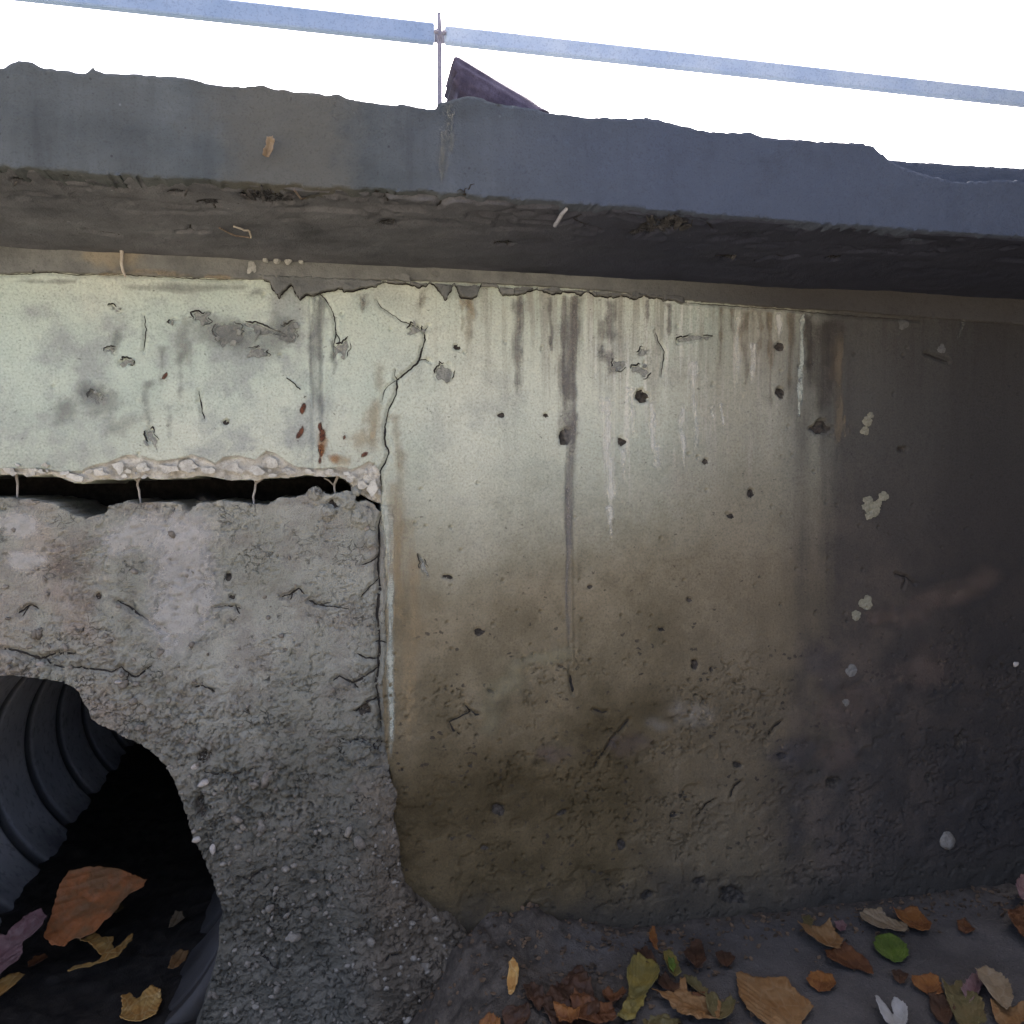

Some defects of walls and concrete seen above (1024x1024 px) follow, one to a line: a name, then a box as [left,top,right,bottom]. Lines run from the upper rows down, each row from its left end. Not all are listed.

peeling [257,271,685,305]
spalling [0,426,381,503]
spalling [190,310,299,358]
corrosion [296,396,306,438]
corrosion [318,422,338,464]
crack [377,301,429,485]
damp [513,297,523,384]
damp [548,296,579,601]
damp [750,313,843,414]
crack [4,648,151,680]
crack [117,600,161,629]
crack [282,515,387,750]